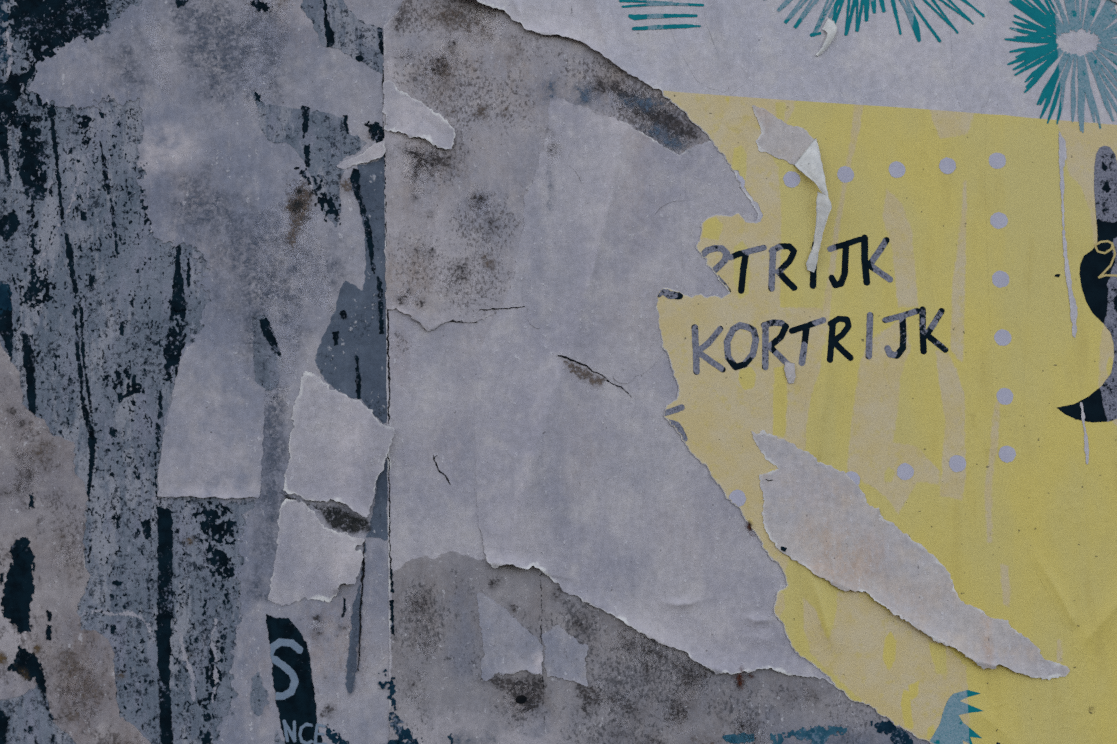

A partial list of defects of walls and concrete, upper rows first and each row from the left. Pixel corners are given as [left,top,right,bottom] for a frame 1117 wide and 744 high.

leakage [323,0,335,47]
leakage [340,0,712,334]
peeling [477,0,685,107]
peeling [345,460,388,694]
peeling [751,430,1070,680]